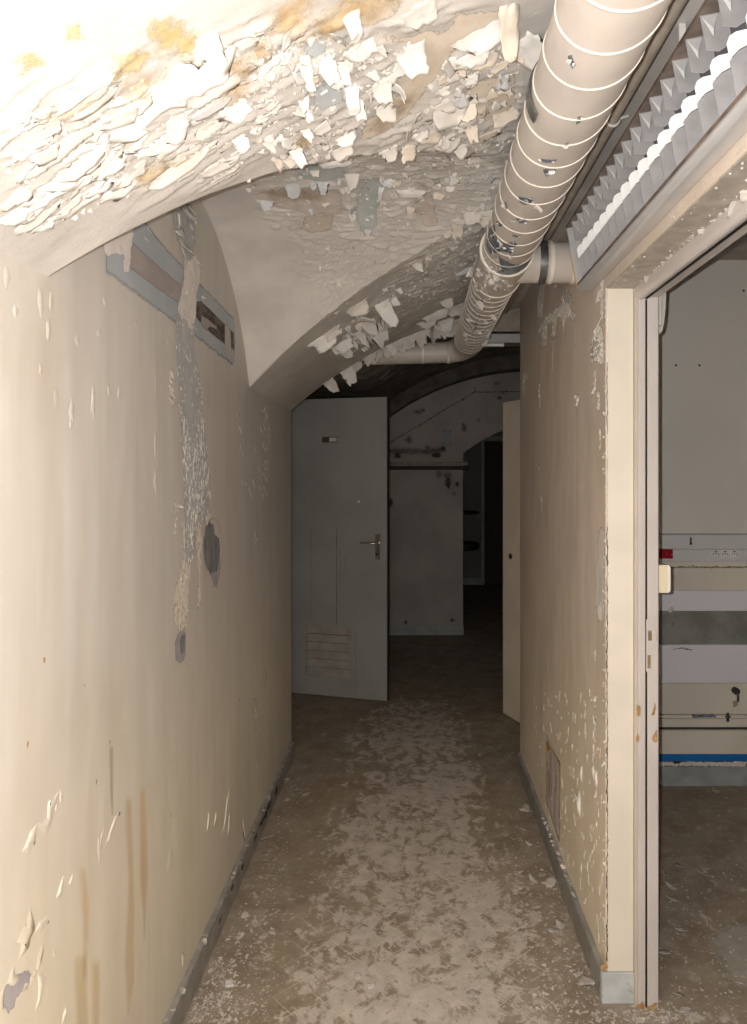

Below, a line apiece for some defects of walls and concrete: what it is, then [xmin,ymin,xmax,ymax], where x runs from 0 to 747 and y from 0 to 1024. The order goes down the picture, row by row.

peeling [0,0,543,393]